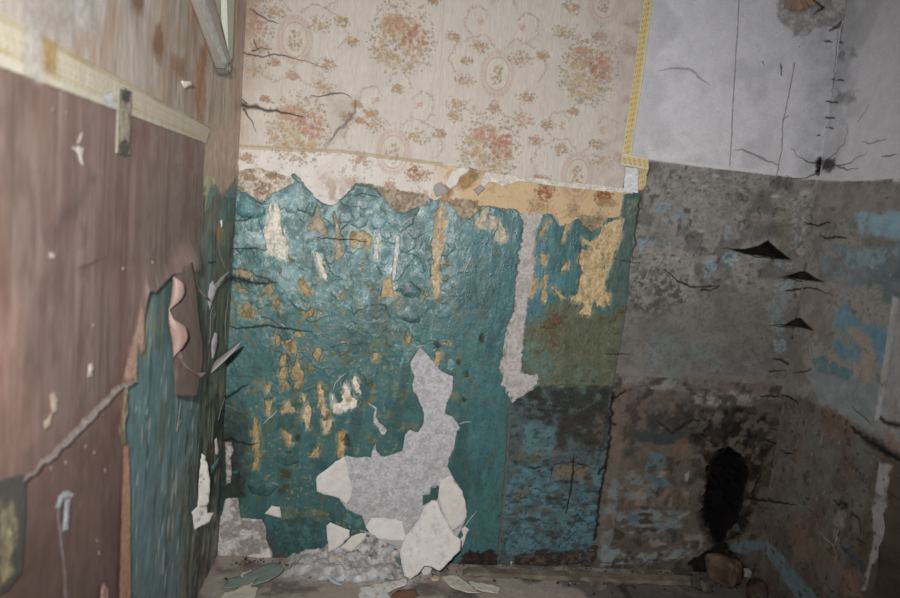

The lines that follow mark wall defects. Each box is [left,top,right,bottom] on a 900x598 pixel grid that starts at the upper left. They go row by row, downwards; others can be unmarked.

spalling [778,0,847,36]
crack [244,39,329,70]
crack [241,99,306,131]
crack [762,20,896,179]
peeling [521,193,640,388]
crack [729,240,833,296]
crack [769,318,812,339]
peeling [210,173,523,583]